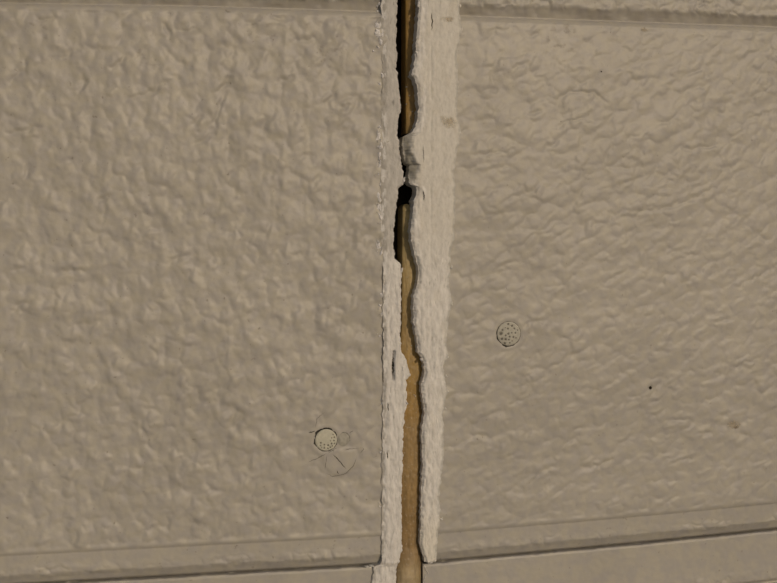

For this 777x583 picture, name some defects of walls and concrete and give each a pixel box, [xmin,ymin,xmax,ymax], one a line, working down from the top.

crack [393,0,425,260]